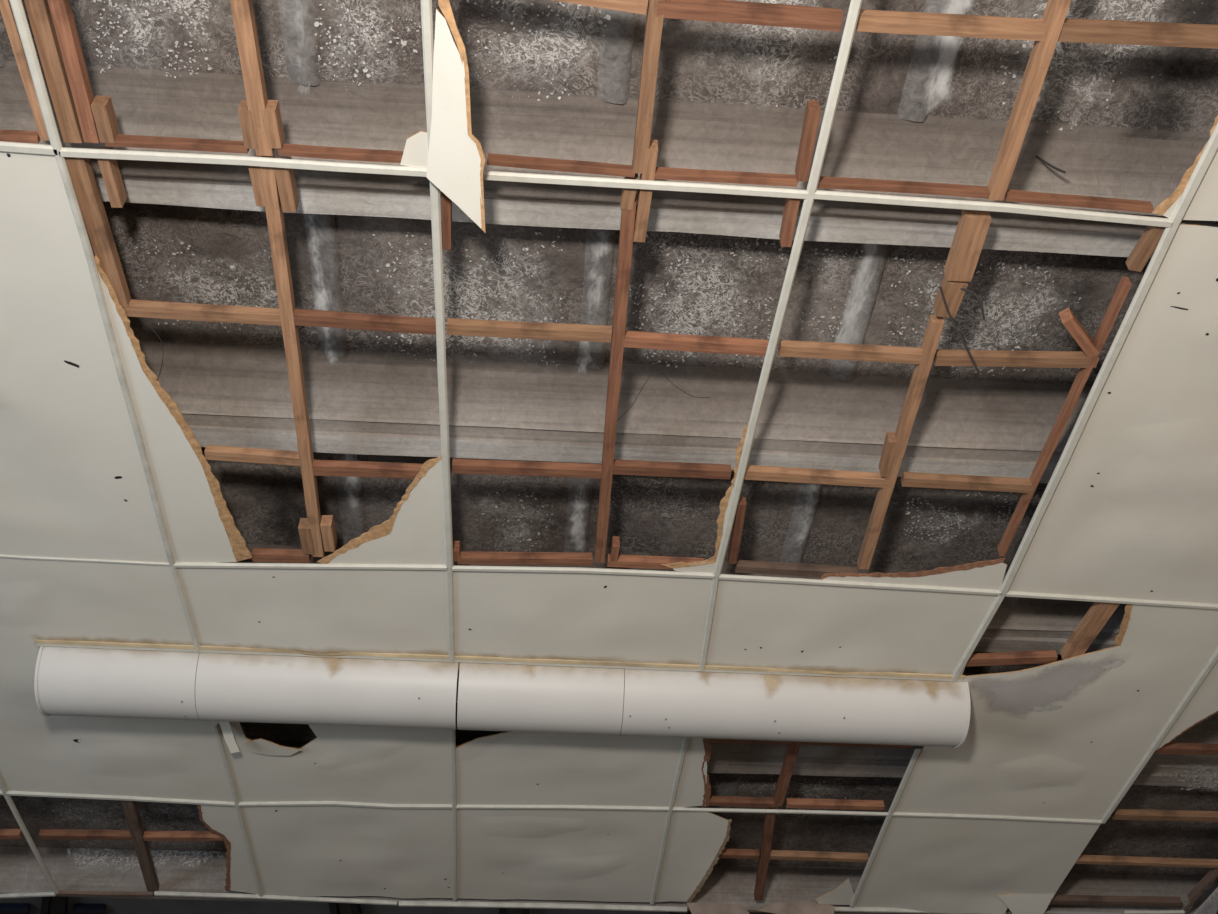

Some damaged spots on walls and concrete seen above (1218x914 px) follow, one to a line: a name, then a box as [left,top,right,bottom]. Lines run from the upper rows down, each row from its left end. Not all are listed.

peeling [973,660,1123,714]